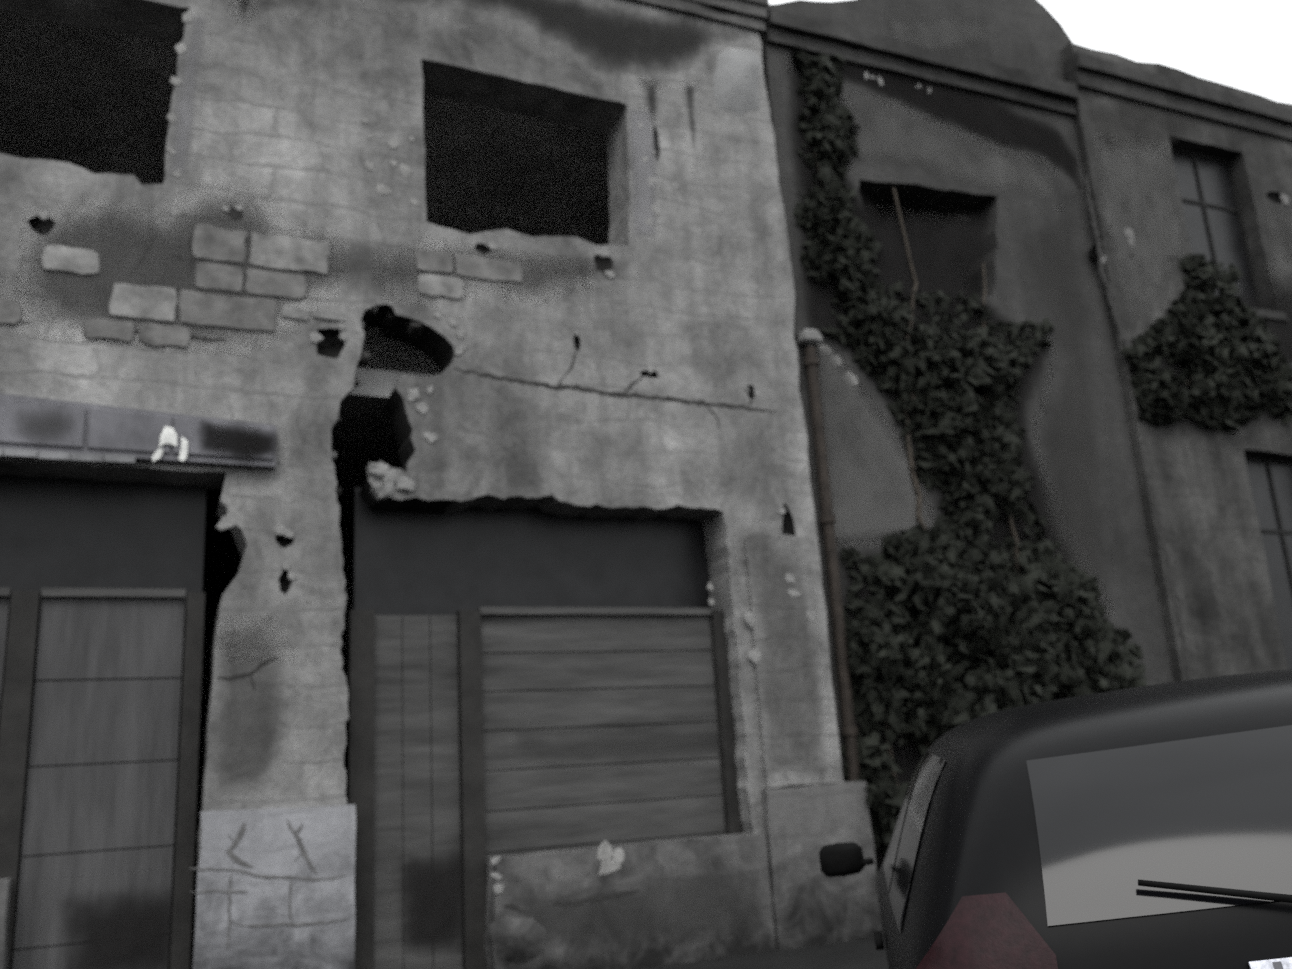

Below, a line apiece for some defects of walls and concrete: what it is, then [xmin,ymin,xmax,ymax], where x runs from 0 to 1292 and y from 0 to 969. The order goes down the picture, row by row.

flaking render [27,211,100,276]
crack [454,350,777,430]